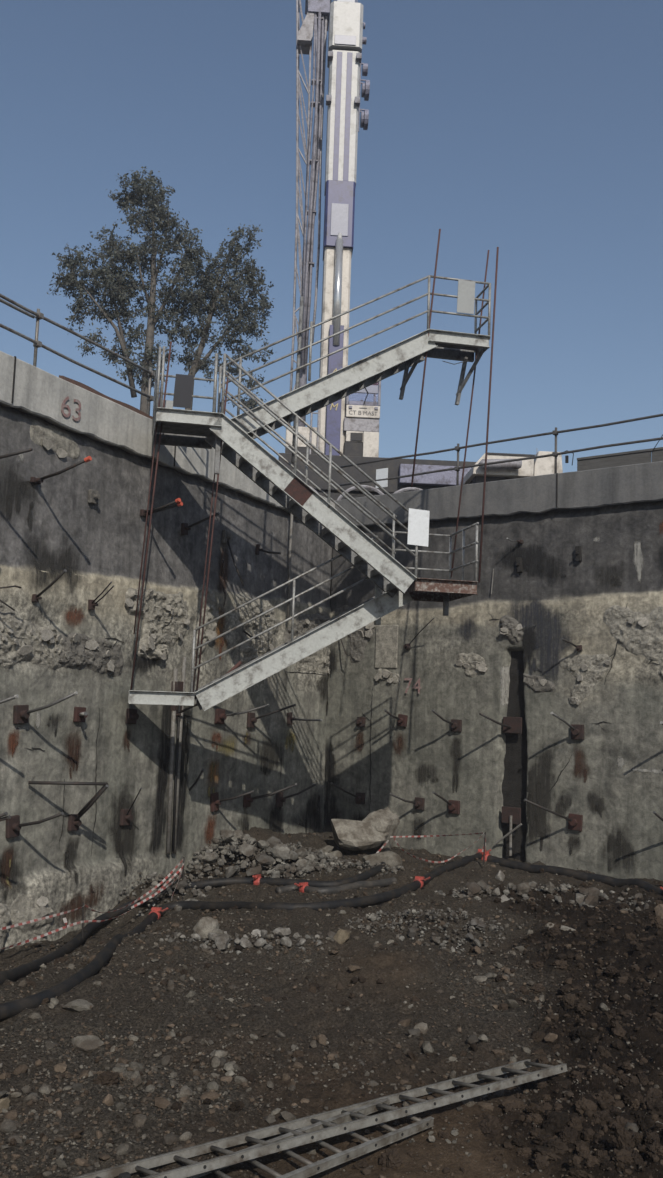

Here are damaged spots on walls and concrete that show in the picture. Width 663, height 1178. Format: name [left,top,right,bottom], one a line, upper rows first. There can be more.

water stain [111,795,137,876]
water stain [149,705,190,853]